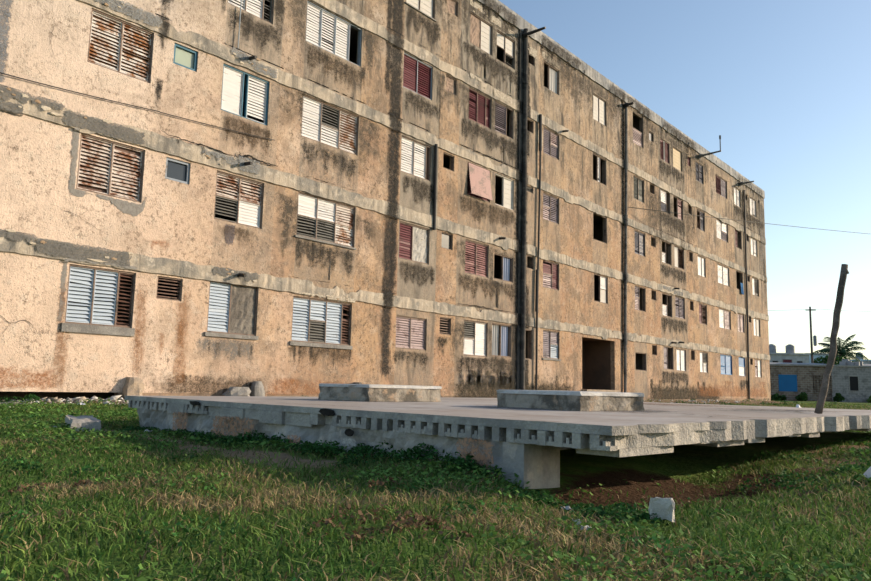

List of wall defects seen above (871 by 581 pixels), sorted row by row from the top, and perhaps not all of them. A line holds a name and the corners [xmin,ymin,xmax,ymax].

spalling [95,0,162,27]
leakage [160,0,174,48]
leakage [223,0,306,47]
spalling [0,0,145,145]
leakage [308,33,375,84]
leakage [225,118,270,147]
leakage [381,0,570,409]
leakage [541,42,628,368]
spalling [0,229,133,266]
leakage [225,224,249,245]
leakage [280,197,353,273]
leakage [290,346,351,366]